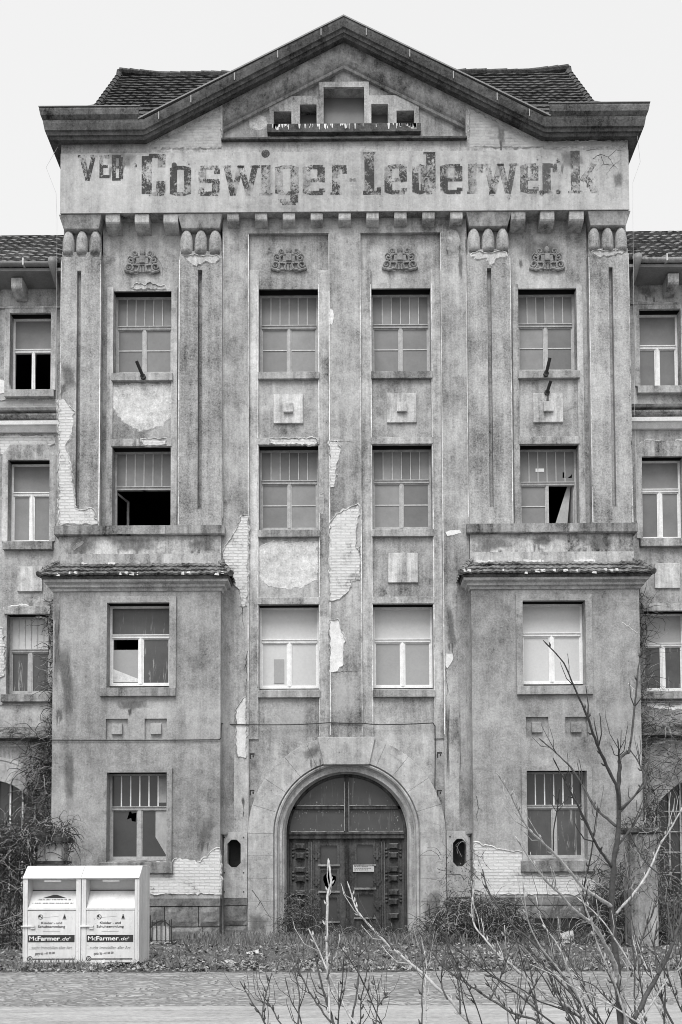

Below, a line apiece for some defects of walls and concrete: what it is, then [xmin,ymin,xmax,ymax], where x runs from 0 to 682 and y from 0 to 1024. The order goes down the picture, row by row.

peeling [0,379,99,526]
spalling [222,436,362,608]
peeling [328,618,347,673]
peeling [234,696,248,759]
peeling [150,847,224,896]
peeling [472,841,598,897]